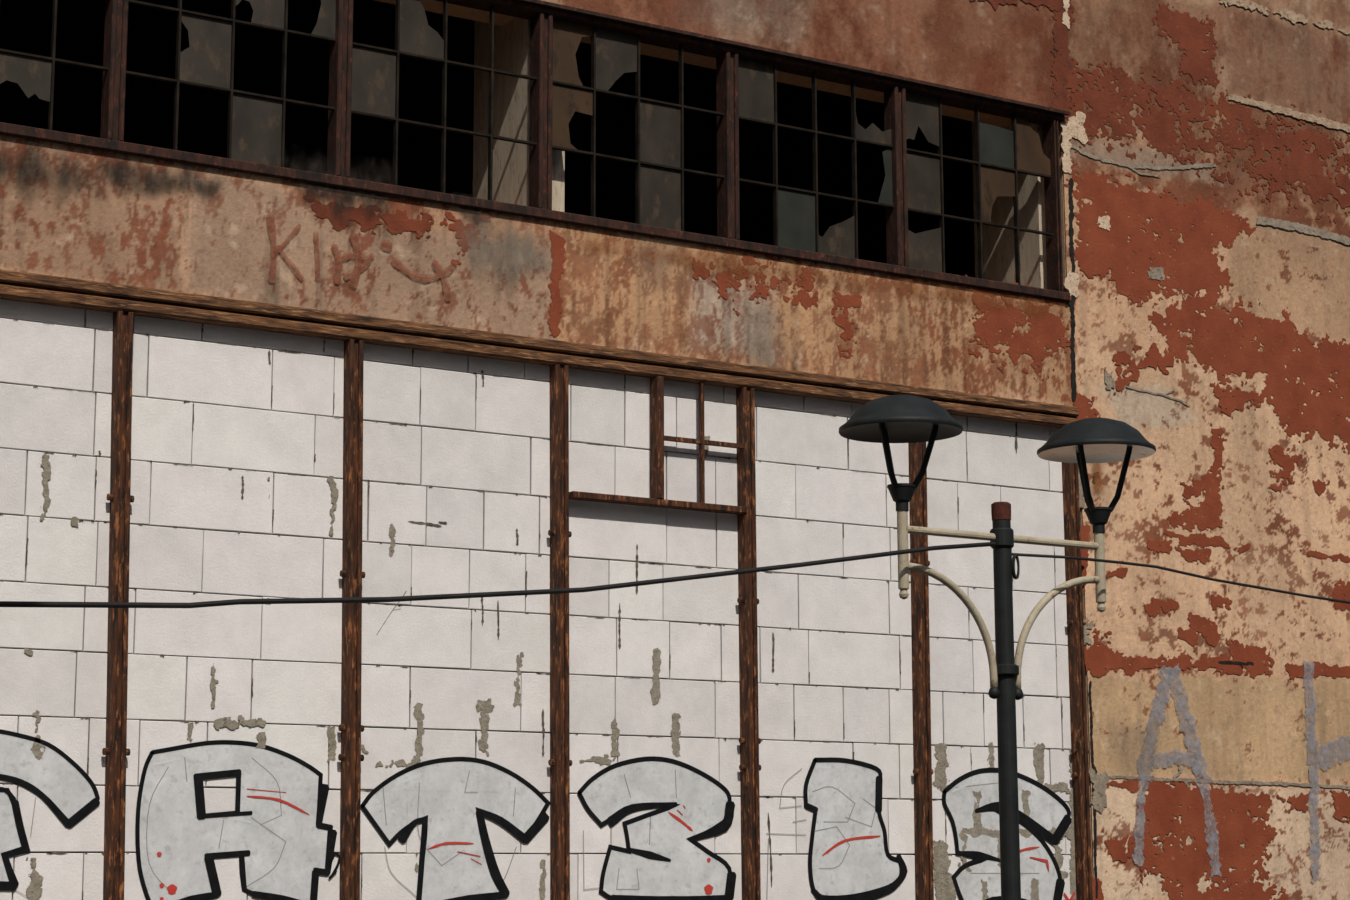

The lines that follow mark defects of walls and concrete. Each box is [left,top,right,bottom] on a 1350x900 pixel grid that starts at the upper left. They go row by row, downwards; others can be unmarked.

peeling [303,192,494,267]
peeling [547,230,566,337]
peeling [692,254,863,366]
peeling [959,0,1350,564]
peeling [1080,524,1091,592]
peeling [1106,567,1128,578]
peeling [1083,594,1350,679]
peeling [1332,578,1350,611]
peeling [1089,768,1310,900]
peeling [1330,790,1350,823]